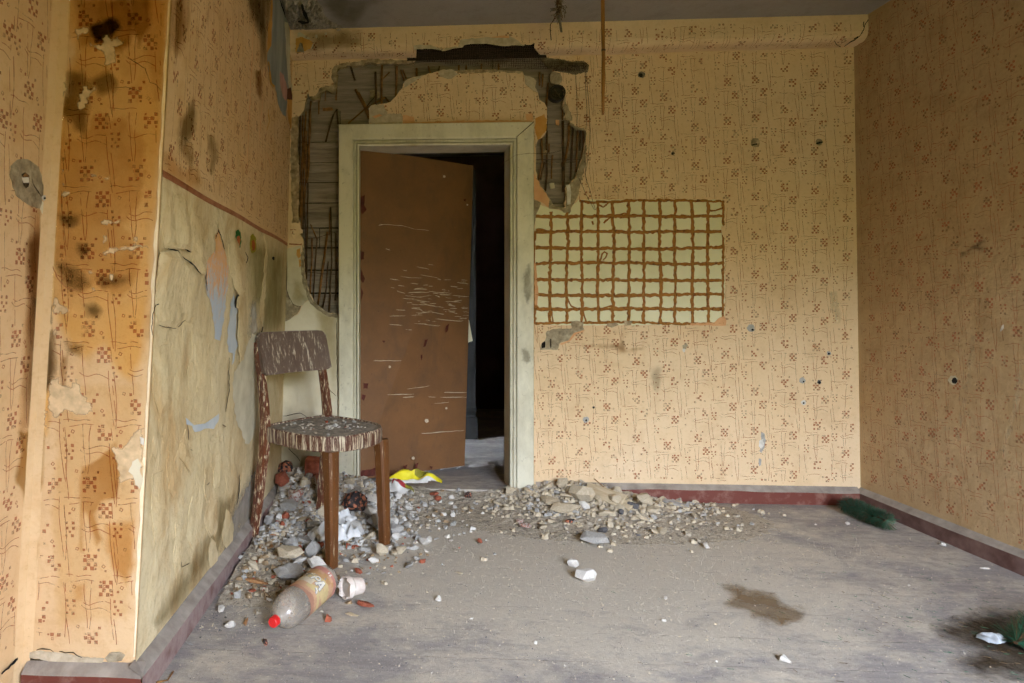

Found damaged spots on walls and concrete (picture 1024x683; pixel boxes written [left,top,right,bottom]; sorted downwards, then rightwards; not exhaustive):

damp [91,18,120,41]
flaking render [267,0,589,421]
peeling [1,0,170,674]
peeling [205,228,259,444]
damp [728,587,801,625]